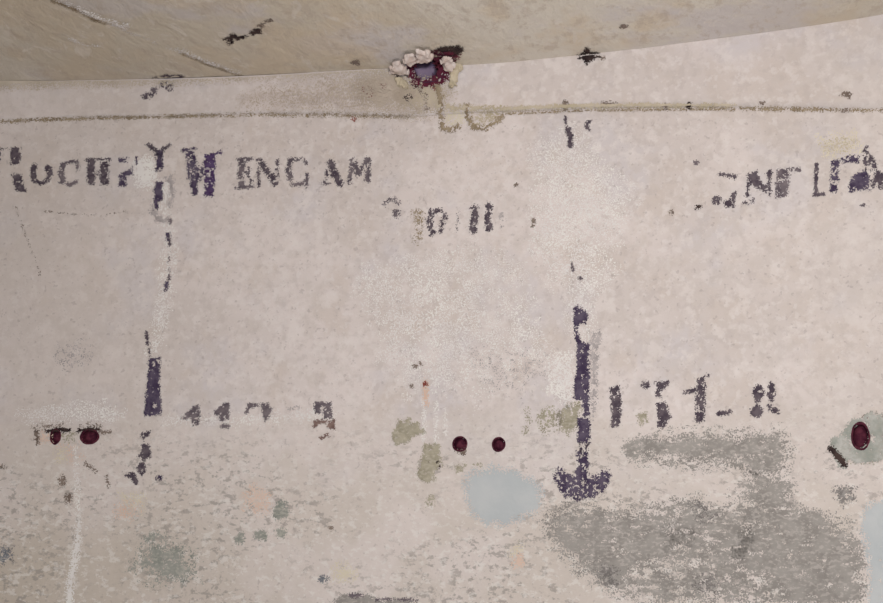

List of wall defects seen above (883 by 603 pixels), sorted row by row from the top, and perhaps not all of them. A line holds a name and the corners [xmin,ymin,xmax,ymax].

crack [51,0,241,76]
spalling [361,44,505,134]